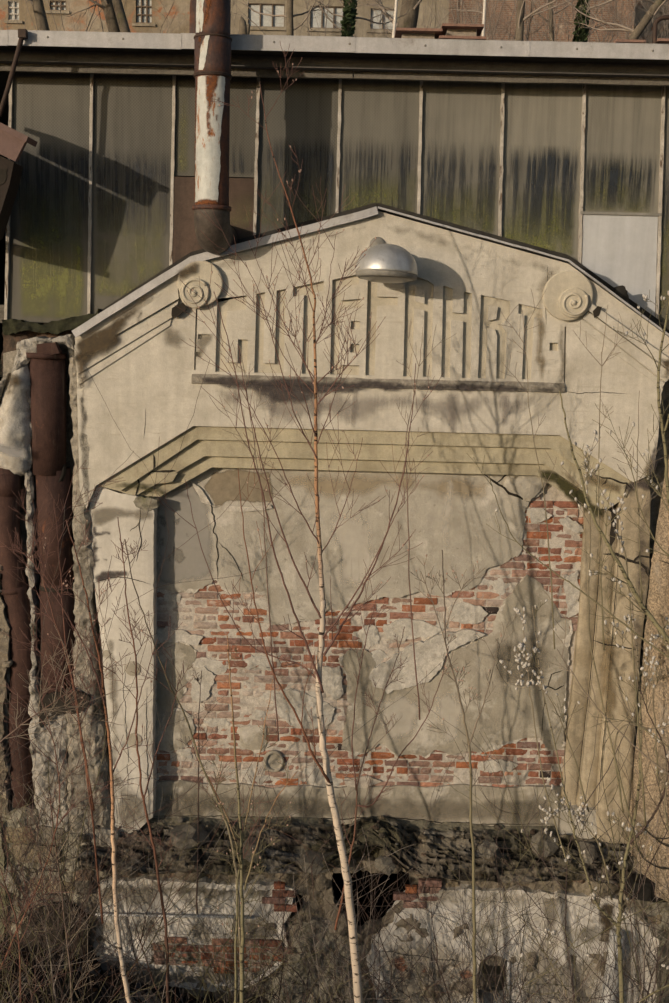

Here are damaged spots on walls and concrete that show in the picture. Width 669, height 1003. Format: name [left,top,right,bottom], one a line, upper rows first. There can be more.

corrosion [194,75,219,205]
damp [18,152,168,213]
damp [425,153,496,215]
damp [509,151,655,220]
spalling [171,302,187,317]
damp [203,377,525,401]
crack [484,474,533,503]
spalling [156,494,583,788]
crack [575,475,669,811]
crack [539,671,562,738]
spalling [332,869,442,926]
spalling [117,922,294,977]